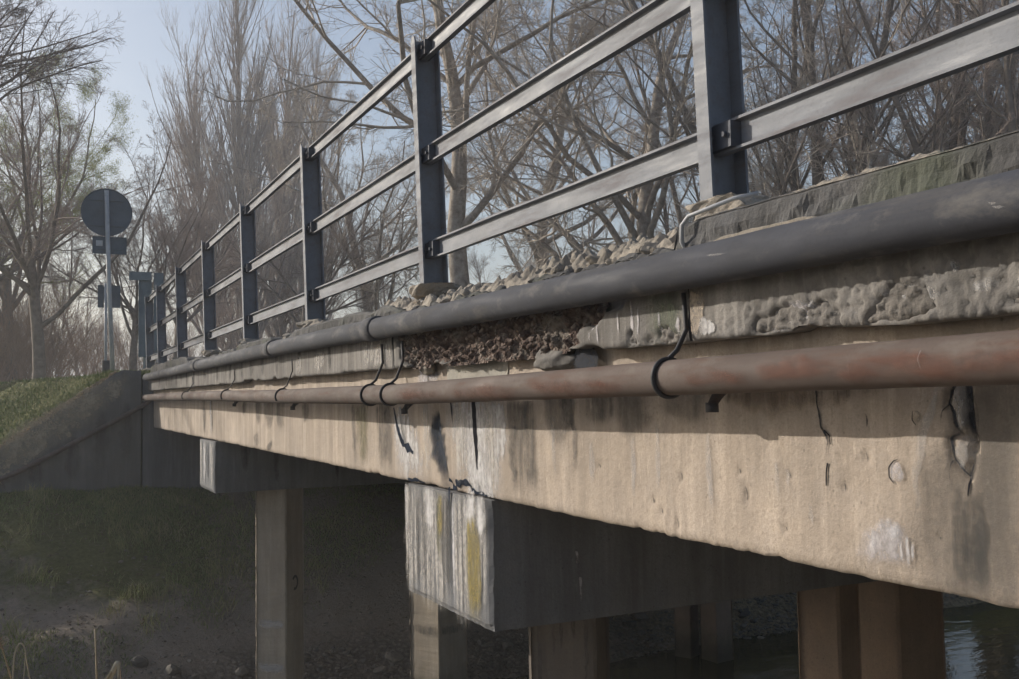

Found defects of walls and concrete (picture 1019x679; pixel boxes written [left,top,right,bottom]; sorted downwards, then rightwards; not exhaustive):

spalling [398,302,609,375]
crack [393,406,413,454]
water stain [377,402,533,606]
crack [448,402,488,509]
crack [815,391,831,486]
crack [941,386,980,496]
water stain [965,393,1010,588]